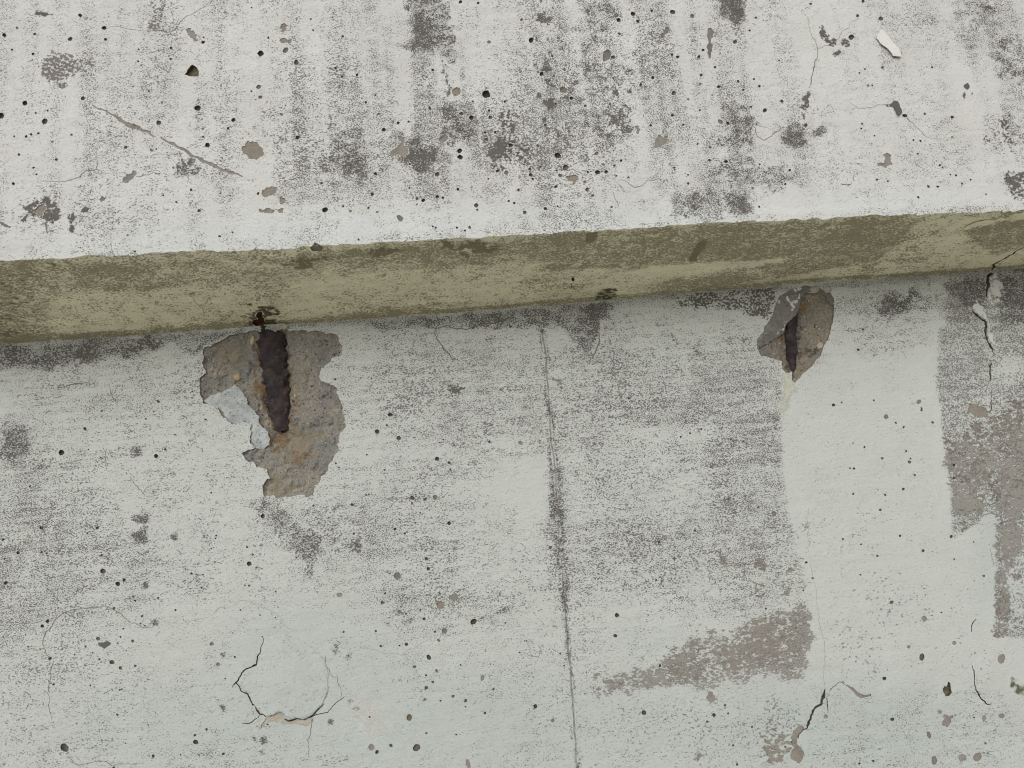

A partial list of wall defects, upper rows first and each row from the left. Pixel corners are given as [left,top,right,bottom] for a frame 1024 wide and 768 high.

corrosion [244,303,280,327]
spalling [199,312,346,498]
spalling [757,286,834,383]
crack [972,247,1024,411]
crack [42,589,344,757]